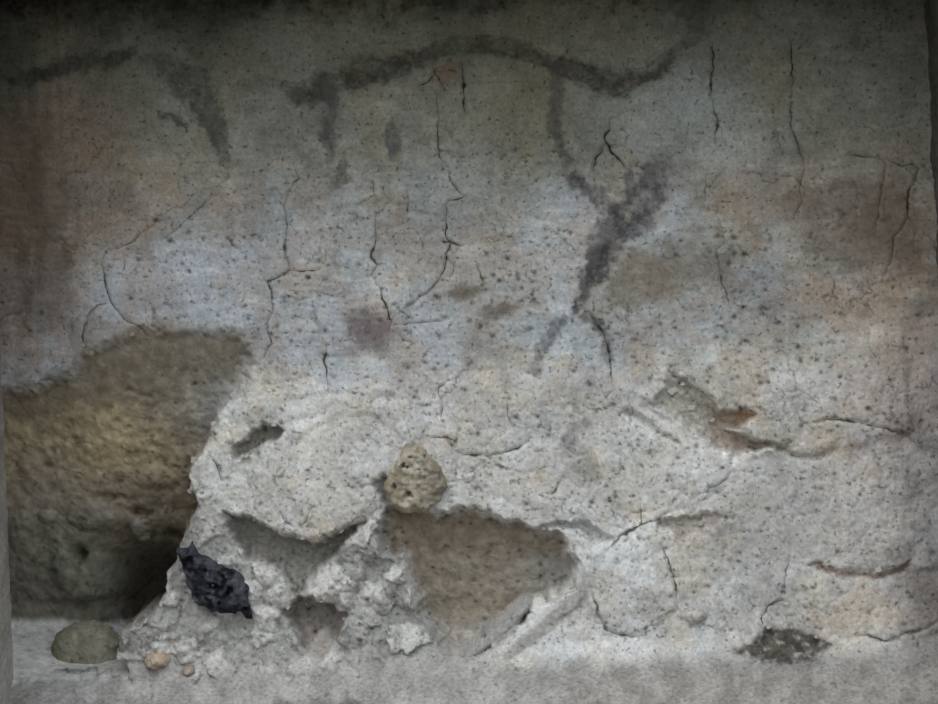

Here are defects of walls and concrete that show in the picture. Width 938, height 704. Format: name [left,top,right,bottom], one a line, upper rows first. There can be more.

crack [420,68,466,297]
crack [594,122,622,166]
crack [82,233,141,344]
crack [268,212,314,307]
crack [379,287,433,341]
crack [595,322,612,396]
damp [568,164,666,330]
spalling [647,365,776,462]
spalling [219,502,582,668]
spalling [653,508,738,545]
spalling [806,557,914,585]
spalling [729,619,830,666]